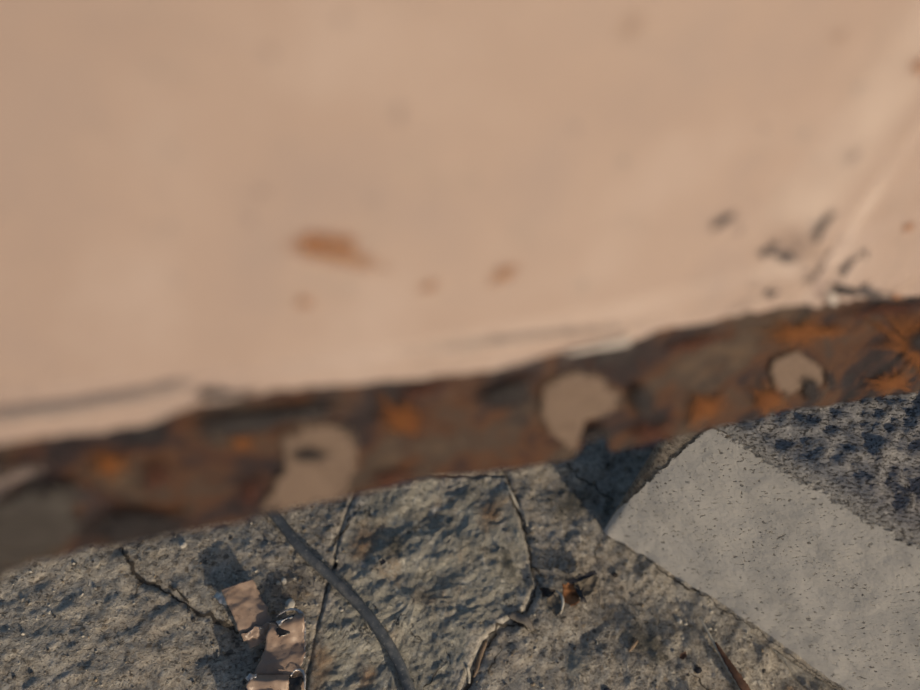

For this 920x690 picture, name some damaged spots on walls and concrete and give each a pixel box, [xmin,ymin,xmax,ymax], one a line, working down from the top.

rust [303,235,370,265]
peeling [760,247,798,263]
peeling [827,258,900,306]
crack [333,504,361,546]
crack [122,547,239,634]
crack [464,470,546,690]